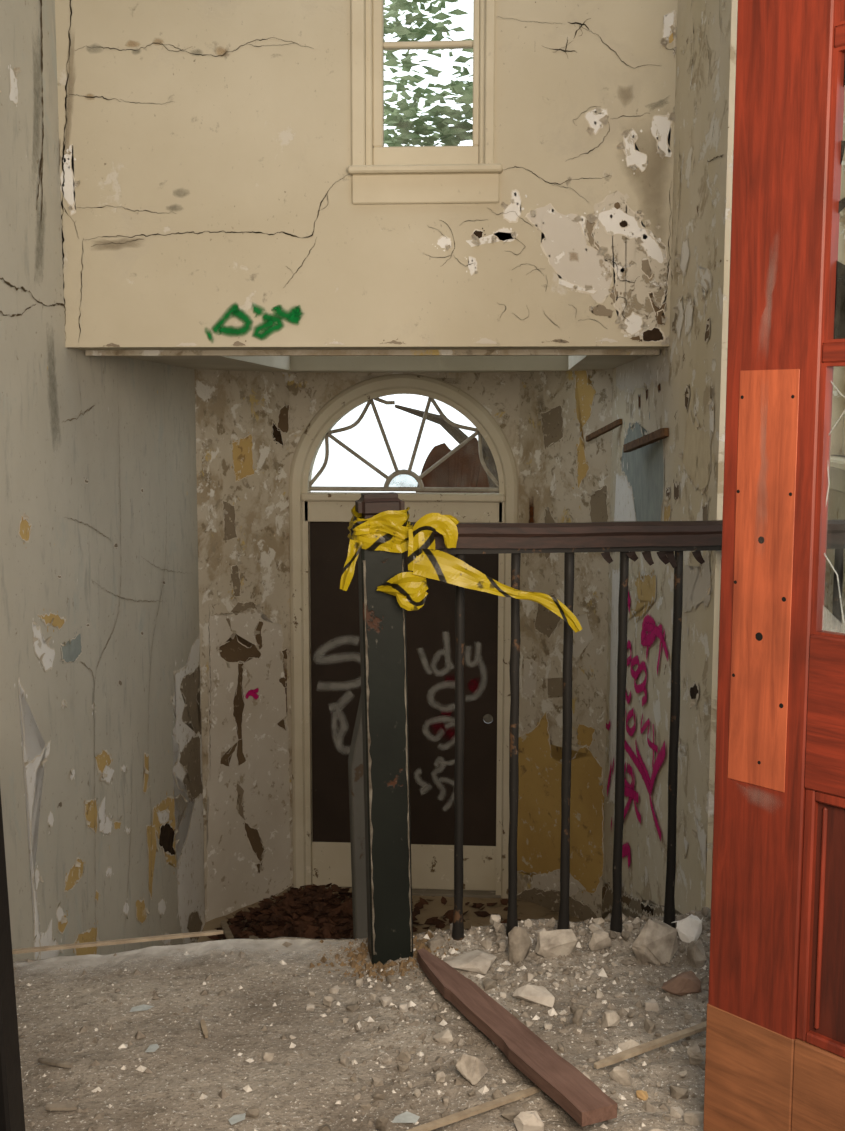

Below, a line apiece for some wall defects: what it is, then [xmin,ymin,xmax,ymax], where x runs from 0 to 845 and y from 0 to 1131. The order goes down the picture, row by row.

crack [498,16,657,68]
crack [0,0,349,342]
peeling [566,106,675,174]
peeling [465,166,712,400]
peeling [230,432,254,482]
flaking render [272,403,291,446]
peeling [538,370,715,523]
peeling [222,500,239,543]
peeling [683,551,711,634]
peeling [84,750,132,836]
peeling [123,561,293,946]
peeling [517,565,681,921]